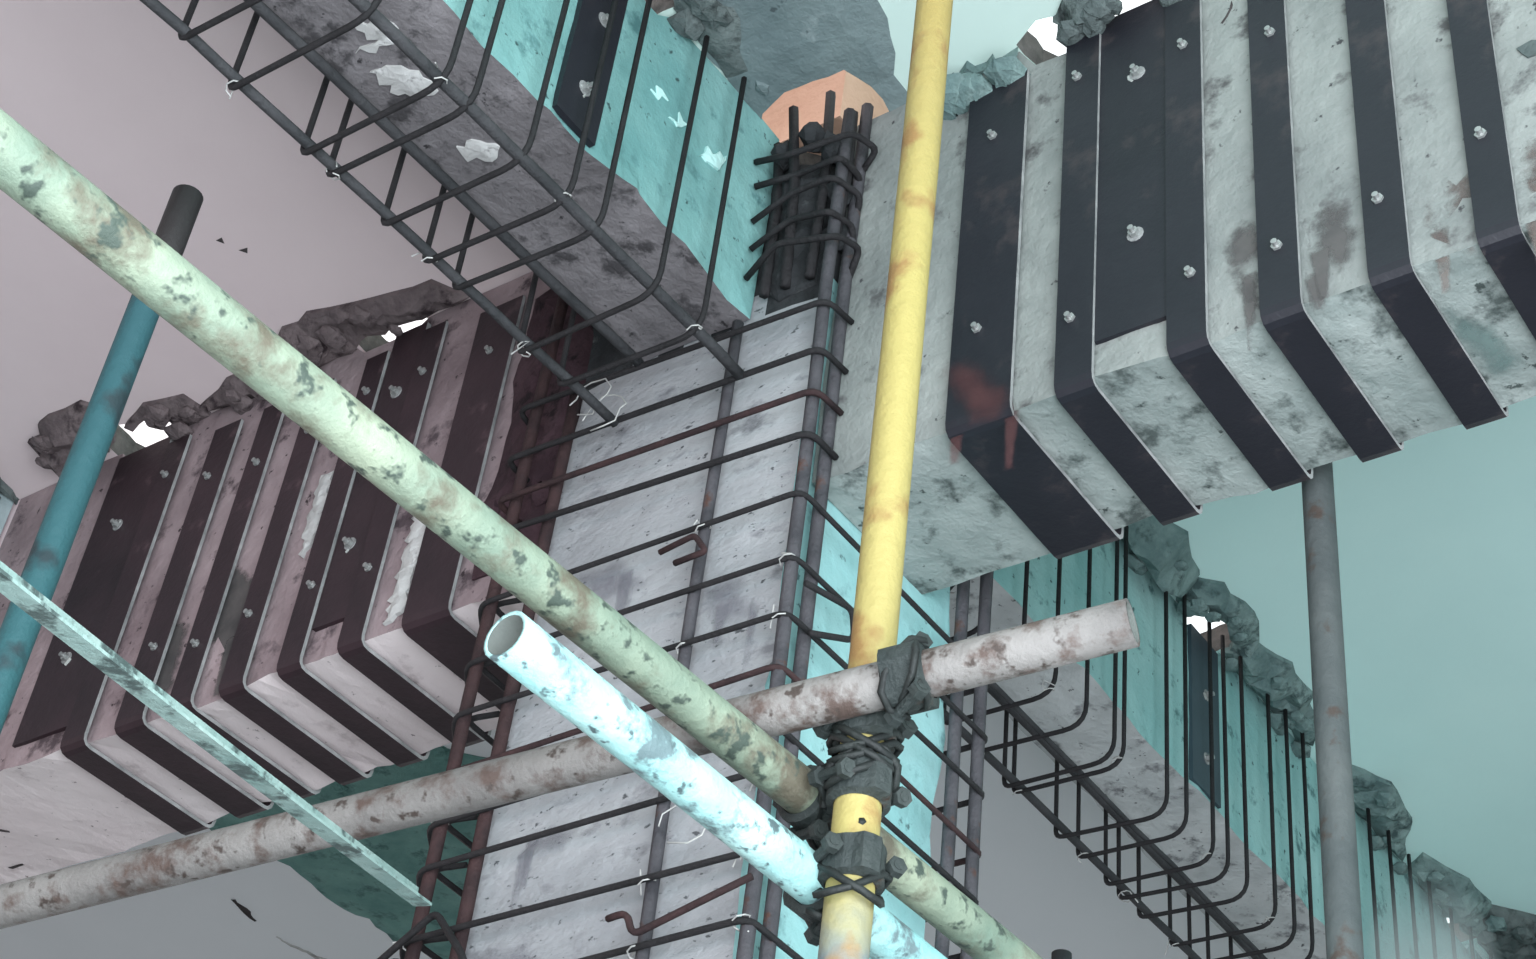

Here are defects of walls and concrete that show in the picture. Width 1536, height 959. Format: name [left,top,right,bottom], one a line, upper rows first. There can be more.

flaking render [667,0,907,120]
spalling [1053,0,1123,47]
peeling [650,85,687,128]
peeling [699,146,727,171]
spalling [770,122,853,302]
spalling [278,279,469,368]
spalling [27,400,89,477]
spalling [108,374,264,453]
corrosion [958,371,1016,466]
spalling [1122,515,1315,758]
spalling [1352,765,1536,959]